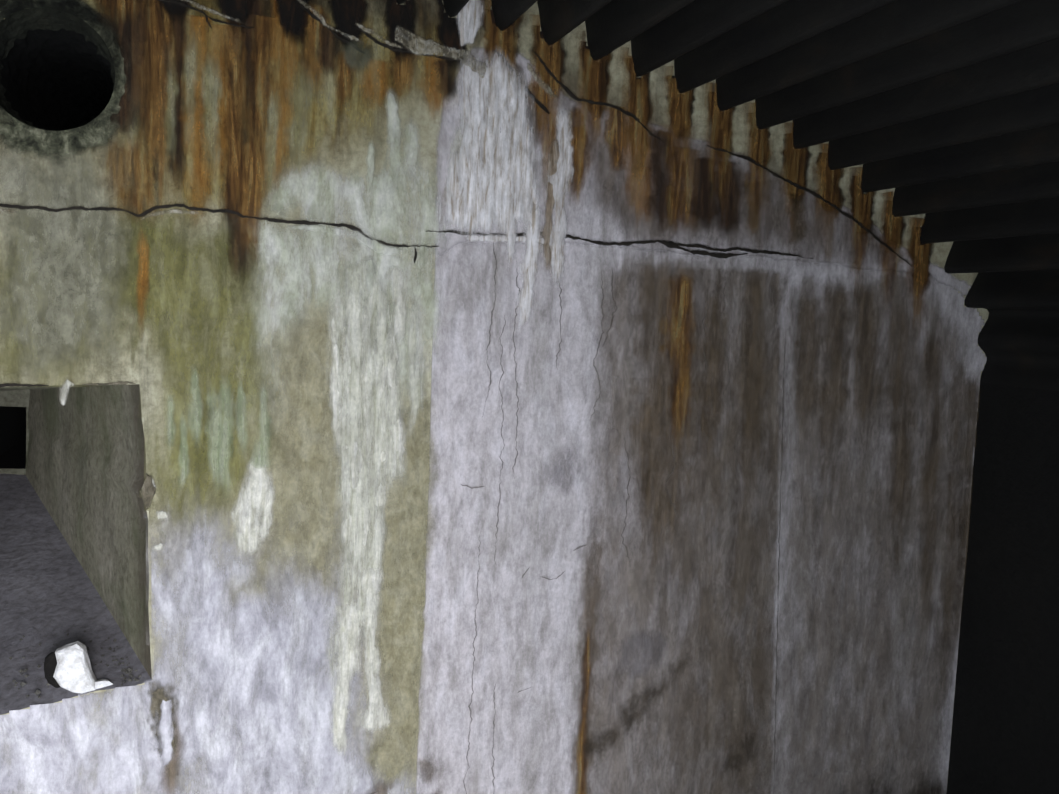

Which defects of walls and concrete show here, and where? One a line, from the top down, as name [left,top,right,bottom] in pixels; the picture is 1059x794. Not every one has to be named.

leakage [167,50,218,148]
corrosion [81,0,466,274]
crack [494,50,662,141]
corrosion [479,0,932,313]
crack [706,145,912,266]
leakage [250,0,573,751]
leakage [232,457,273,552]
crack [0,203,813,794]
corrosion [574,641,594,794]